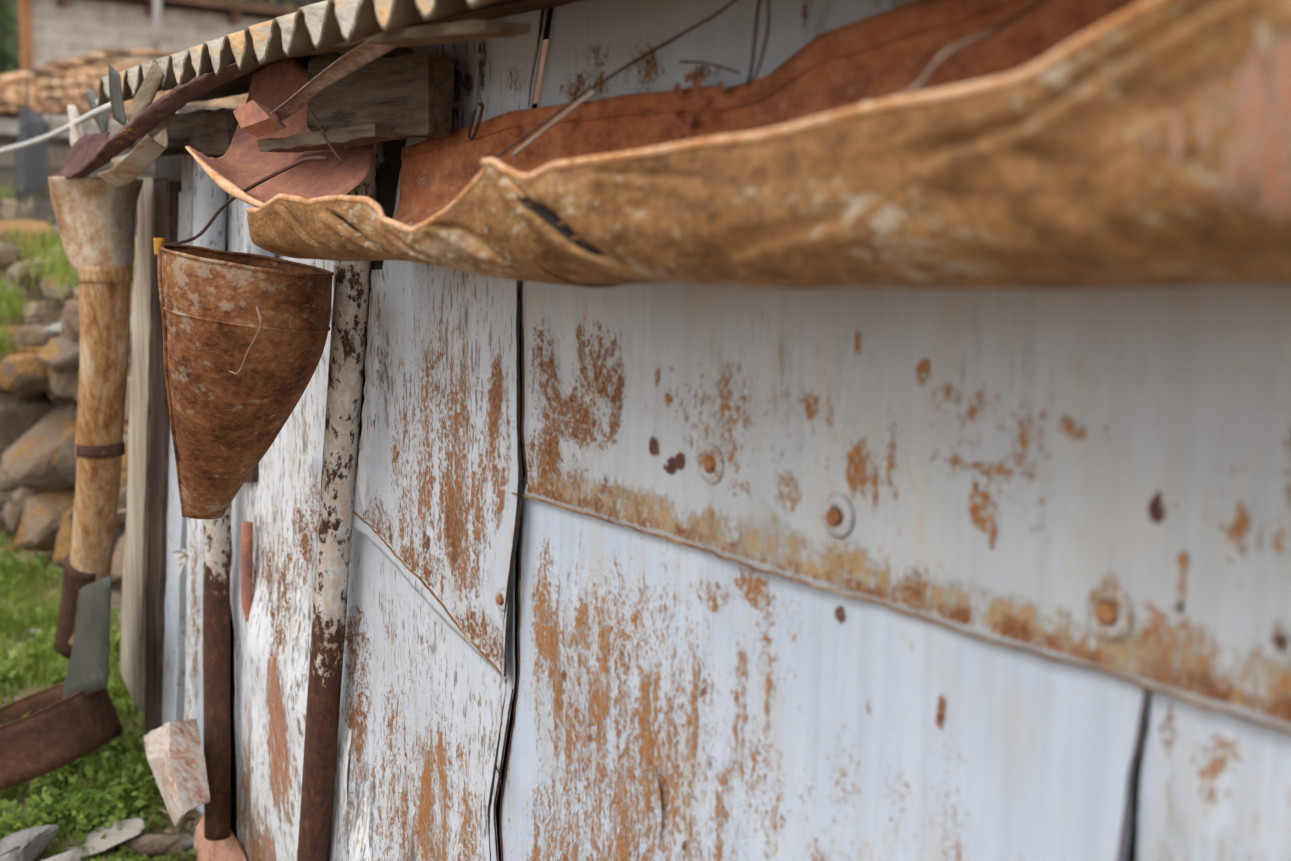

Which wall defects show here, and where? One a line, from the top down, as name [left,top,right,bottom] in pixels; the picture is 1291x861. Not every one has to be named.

crack [488,288,522,861]
crack [1127,691,1150,861]